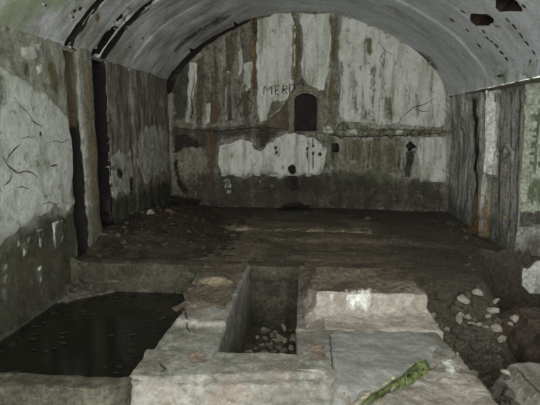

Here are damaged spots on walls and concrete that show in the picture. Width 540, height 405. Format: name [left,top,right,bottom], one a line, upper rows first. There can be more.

crack [2,87,41,189]
peeling [186,62,197,123]
leakage [0,0,441,335]
crack [174,70,293,132]
peeling [218,13,333,193]
crack [319,100,445,137]
rust [459,174,491,241]
leakage [509,76,540,231]